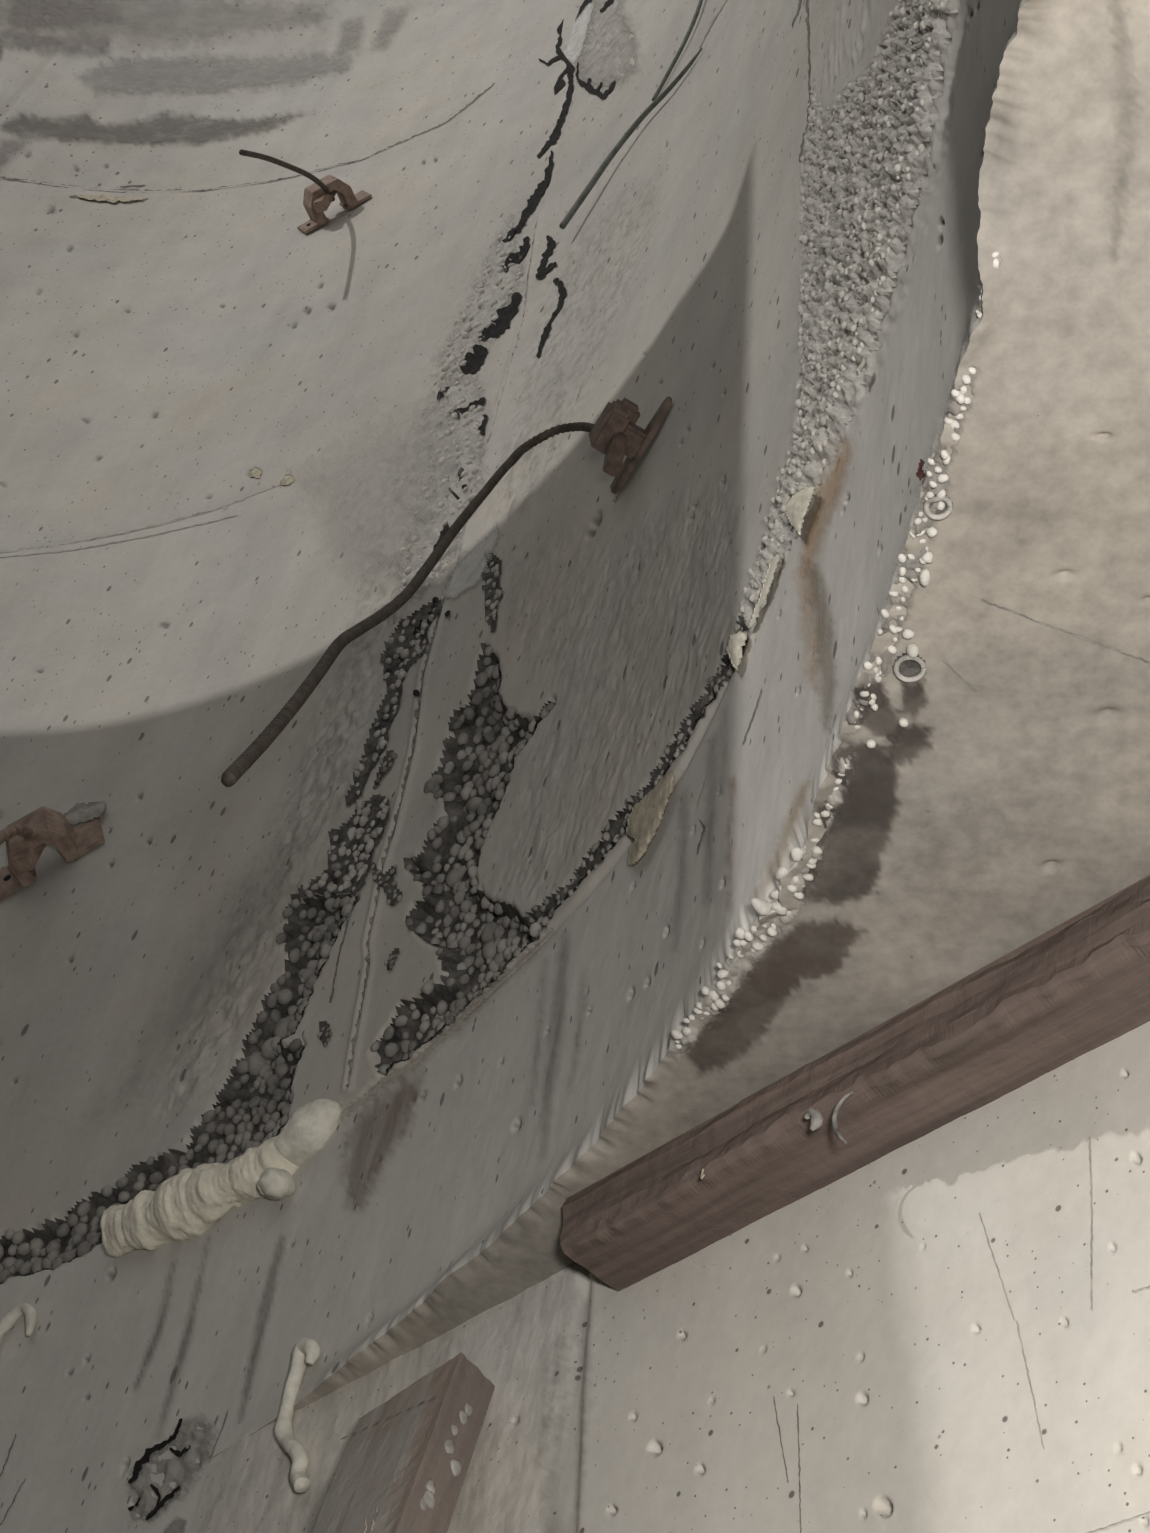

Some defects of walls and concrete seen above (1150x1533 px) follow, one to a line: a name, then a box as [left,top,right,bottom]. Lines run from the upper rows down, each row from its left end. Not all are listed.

spalling [734,0,958,638]
spalling [973,288,983,322]
crack [329,0,615,1088]
spalling [845,365,976,748]
spalling [0,227,734,1284]
spalling [671,755,851,1059]
damp [687,921,856,1070]
damp [801,682,930,902]
crack [0,1433,26,1525]
spalling [128,1420,211,1520]